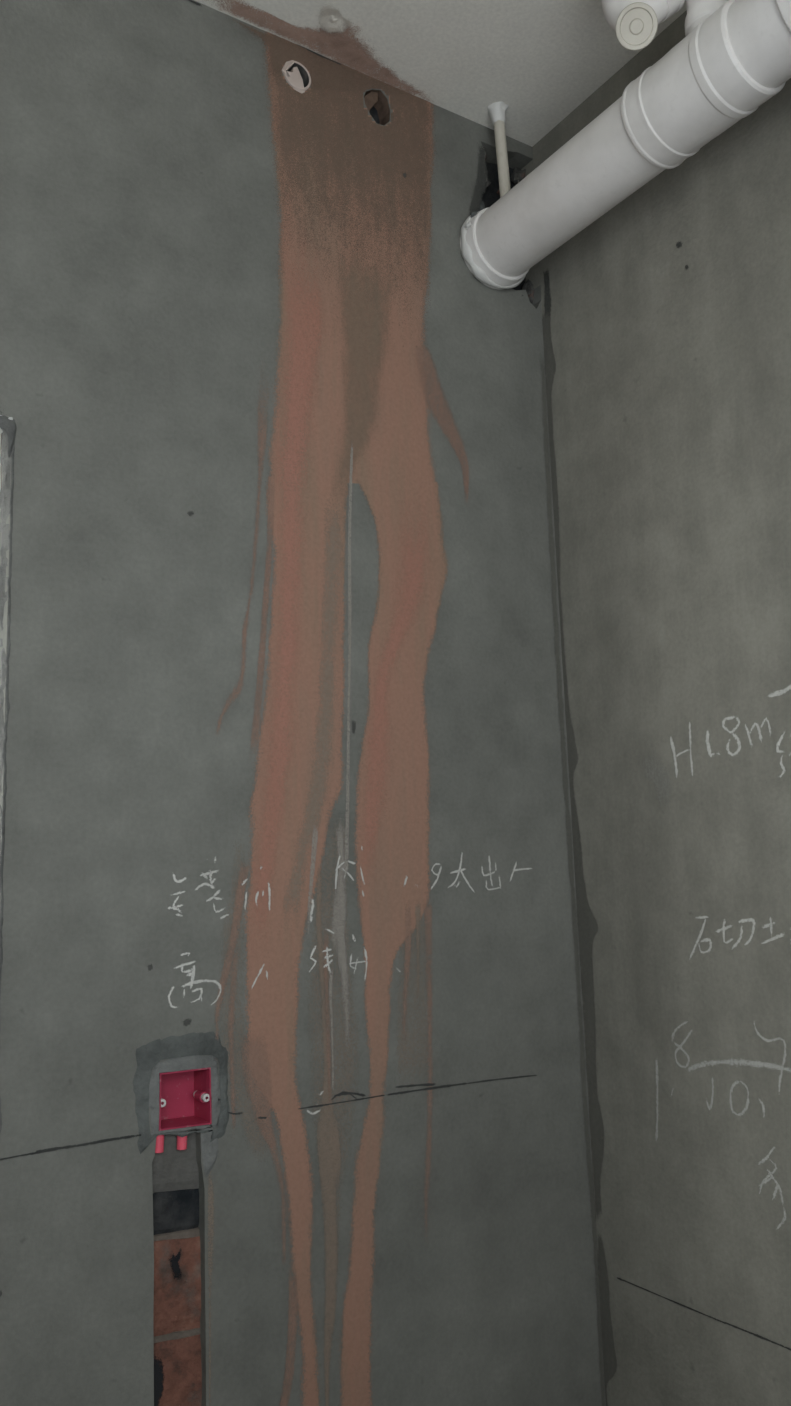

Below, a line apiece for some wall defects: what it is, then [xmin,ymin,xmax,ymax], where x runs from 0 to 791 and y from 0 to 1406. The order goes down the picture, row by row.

rust [214,31,470,1406]